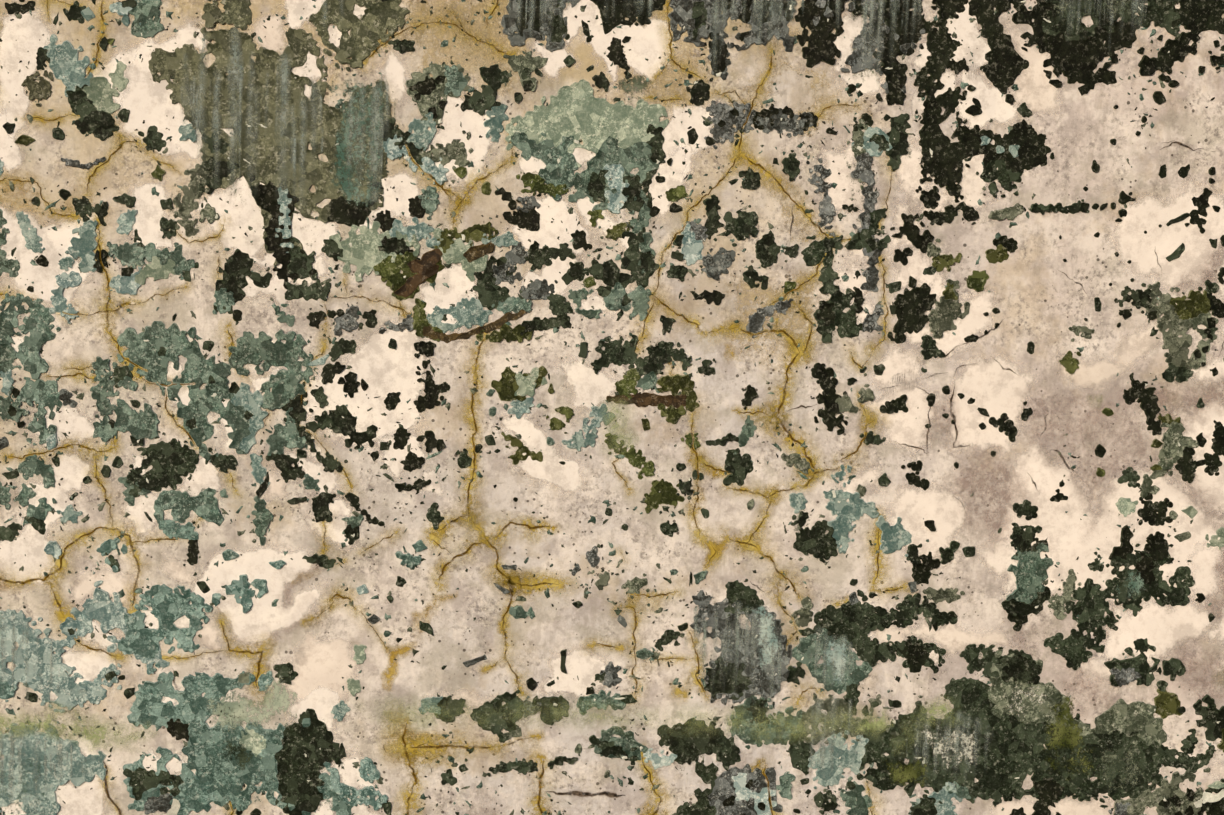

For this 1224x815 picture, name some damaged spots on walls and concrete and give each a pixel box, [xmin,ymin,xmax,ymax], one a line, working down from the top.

crack [0,178,196,447]
peeling [0,0,1224,603]
crack [636,1,1016,644]
peeling [0,723,107,815]
crack [0,436,176,657]
spalling [0,538,336,713]
peeling [123,633,391,815]
crack [431,339,558,690]
crack [383,723,662,815]
peeling [418,646,638,743]
crack [593,592,705,694]
peeling [589,164,1224,815]